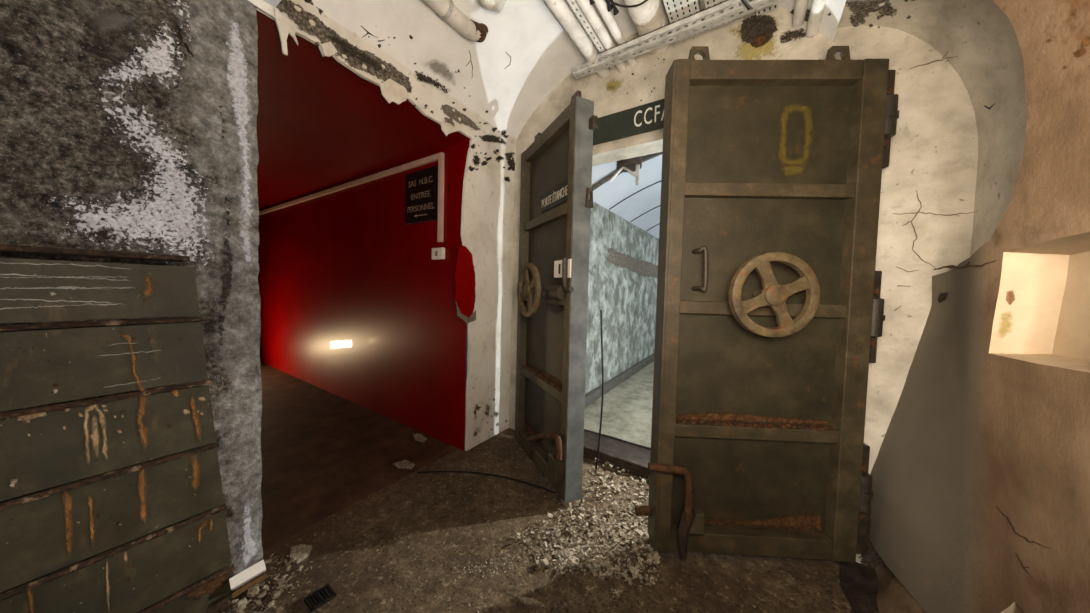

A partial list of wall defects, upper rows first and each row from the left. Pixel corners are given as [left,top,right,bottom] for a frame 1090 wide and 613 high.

flaking render [274,0,515,182]
damp [48,0,254,340]
crack [893,190,996,311]
rust [7,412,46,436]
rust [65,404,122,472]
rust [120,333,147,446]
rust [183,397,205,436]
rust [64,494,73,552]
rust [88,496,100,543]
rust [138,469,147,521]
damp [240,504,257,566]